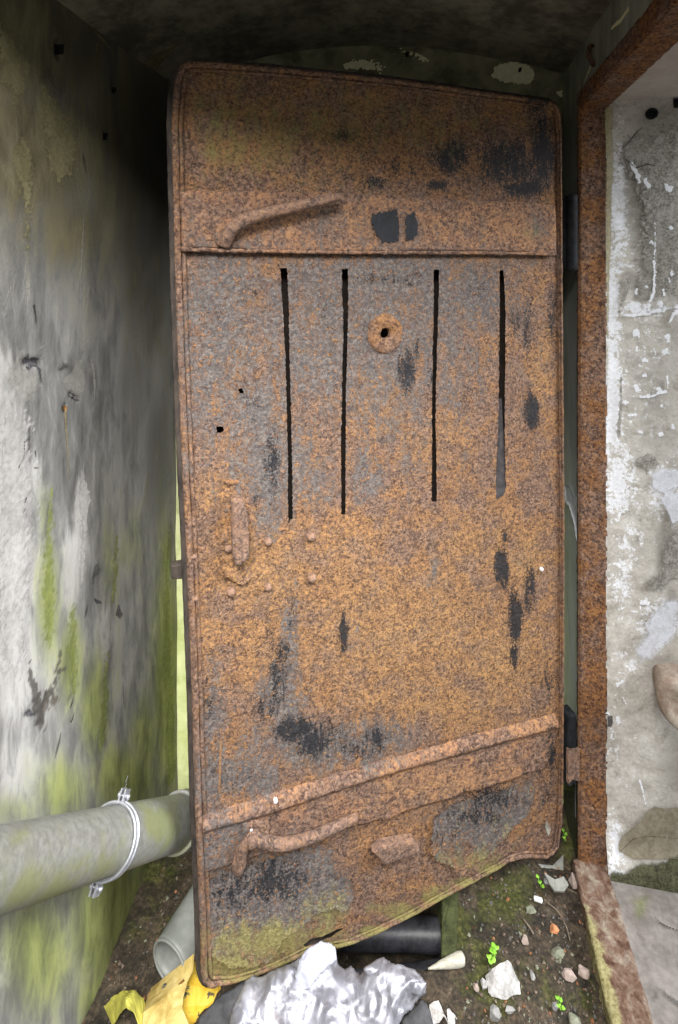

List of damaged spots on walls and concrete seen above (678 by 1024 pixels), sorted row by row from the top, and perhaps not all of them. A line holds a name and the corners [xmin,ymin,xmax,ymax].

flaking render [343,58,385,74]
flaking render [491,60,535,85]
peeling [616,124,678,313]
peeling [617,329,671,438]
damp [26,650,66,731]